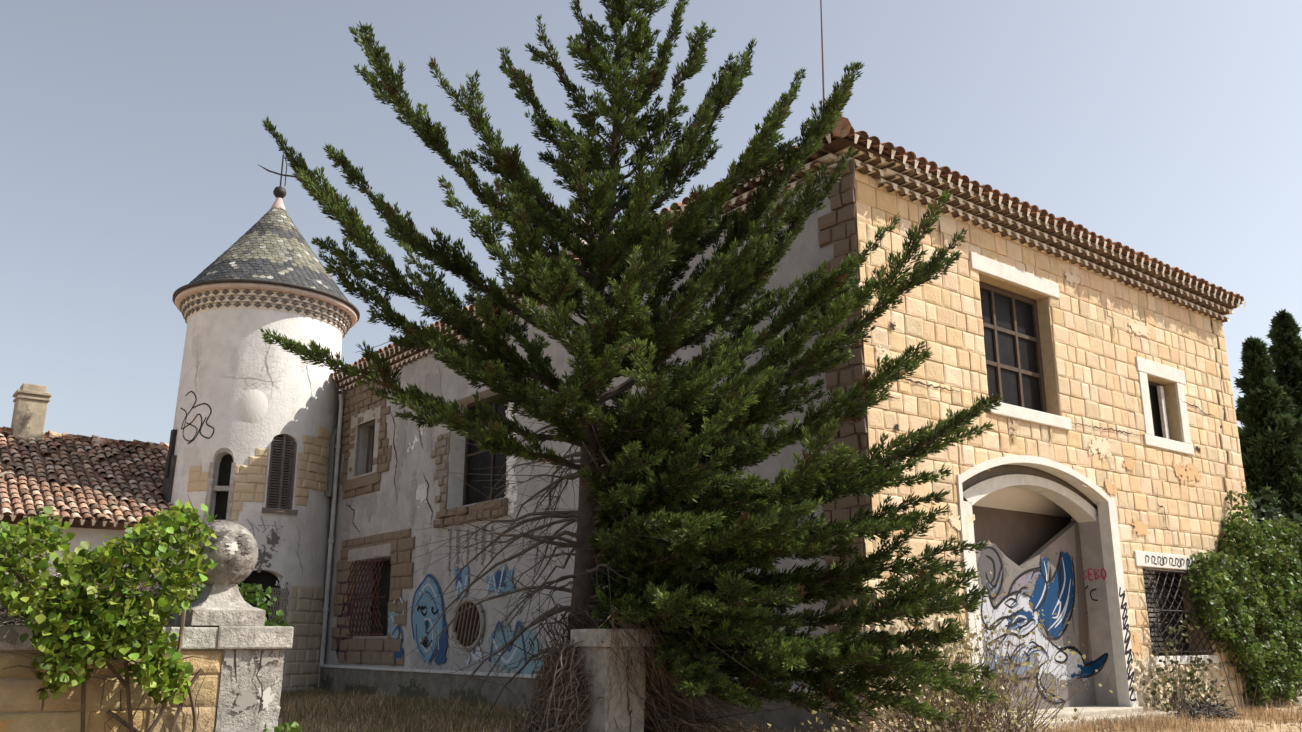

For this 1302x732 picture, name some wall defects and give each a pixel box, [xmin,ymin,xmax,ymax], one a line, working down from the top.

flaking render [210,448,269,564]
flaking render [277,378,451,513]